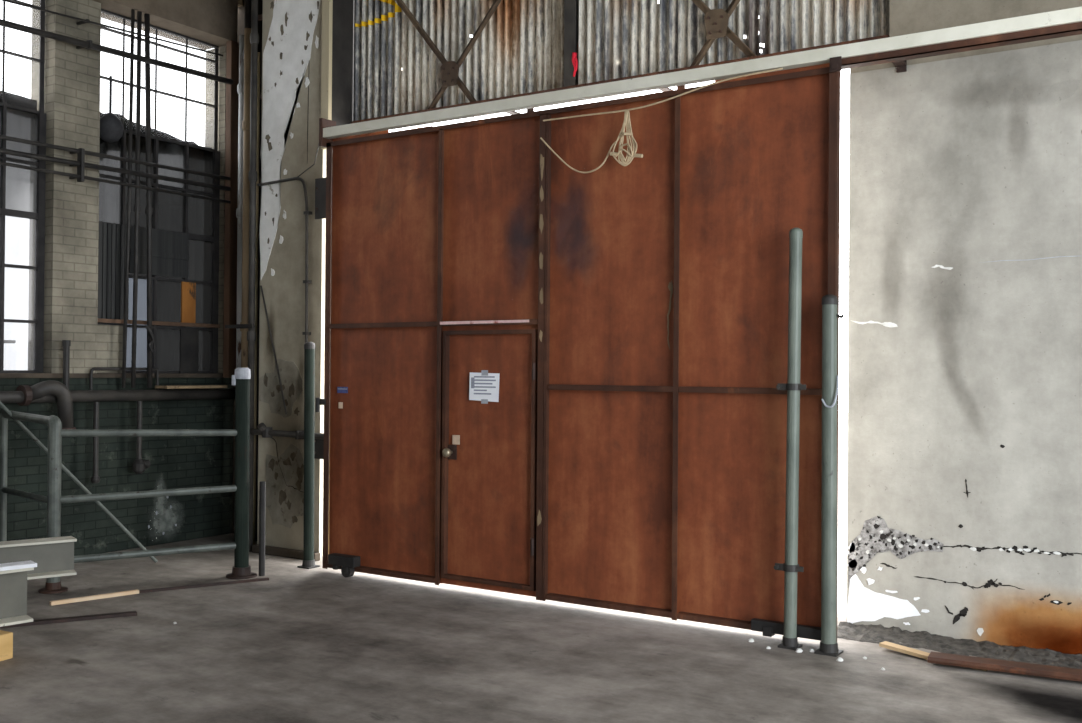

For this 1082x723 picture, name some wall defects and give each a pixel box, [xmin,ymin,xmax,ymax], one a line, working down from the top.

spalling [847,516,943,625]
spalling [945,606,968,624]